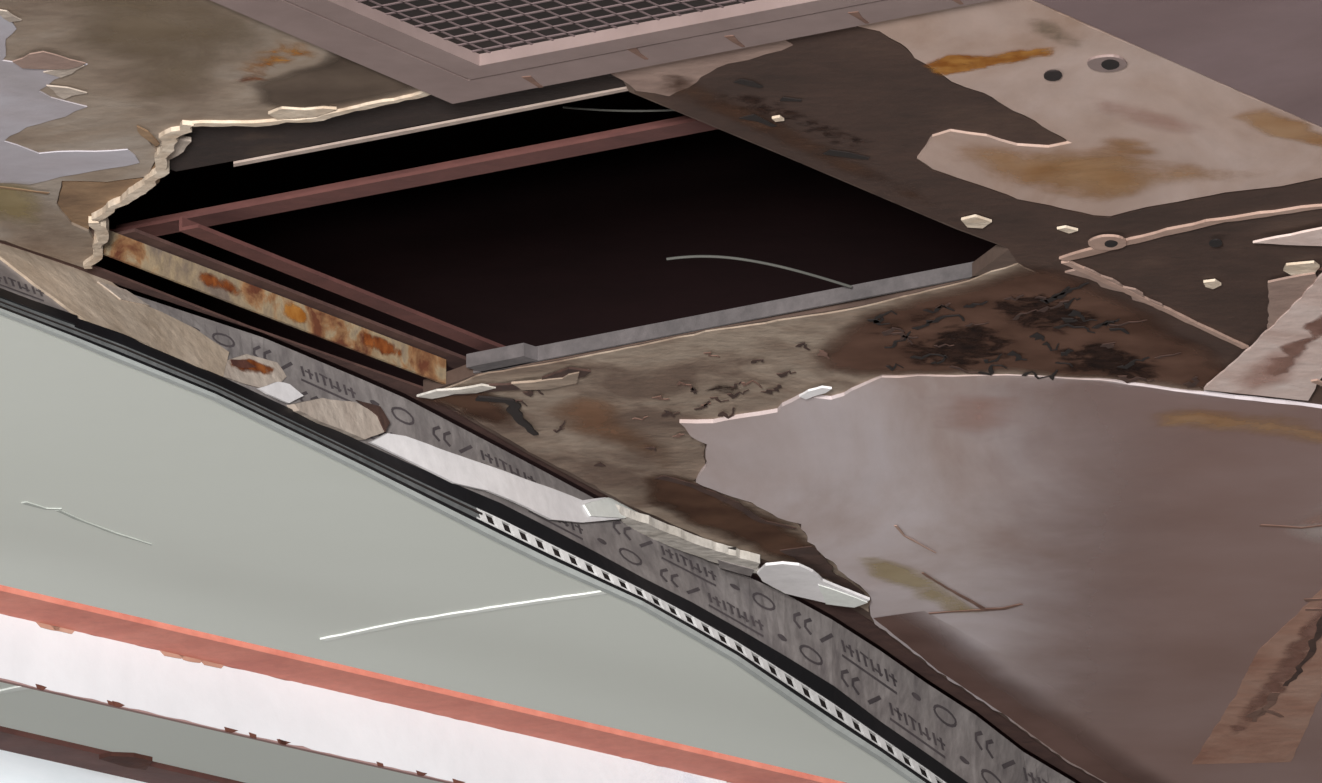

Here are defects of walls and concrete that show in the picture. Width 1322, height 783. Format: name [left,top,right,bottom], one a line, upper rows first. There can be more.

damp [980,143,1201,196]
peeling [634,26,1322,369]
corrosion [200,274,238,294]
corrosion [284,304,306,322]
corrosion [364,333,401,356]
peeling [1300,378,1322,405]
peeling [368,433,637,523]
crack [21,501,152,545]
damp [795,270,1322,783]
crack [1259,522,1322,530]
peeling [757,561,870,608]
crack [1245,598,1322,722]